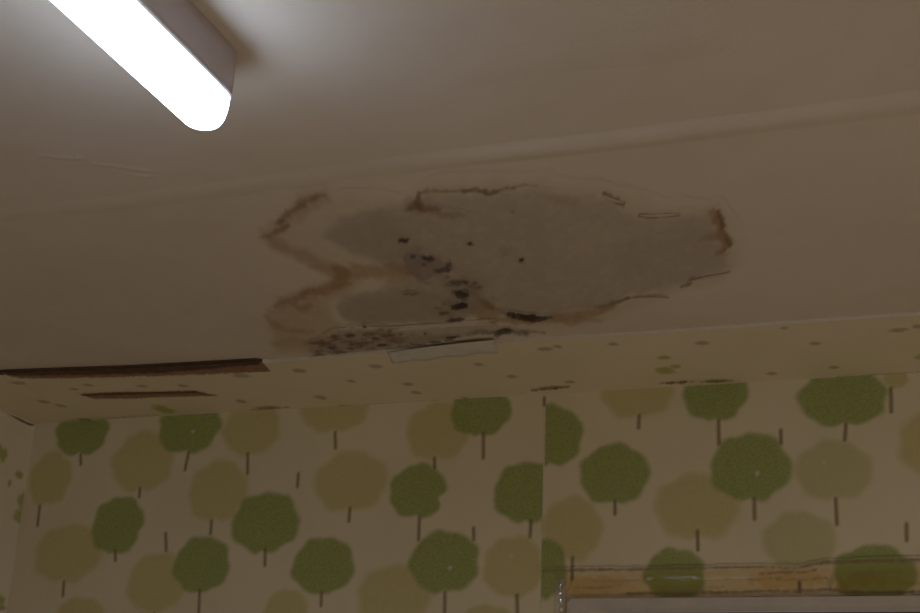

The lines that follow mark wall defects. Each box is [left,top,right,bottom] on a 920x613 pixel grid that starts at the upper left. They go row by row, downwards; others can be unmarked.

water stain [253,169,749,359]